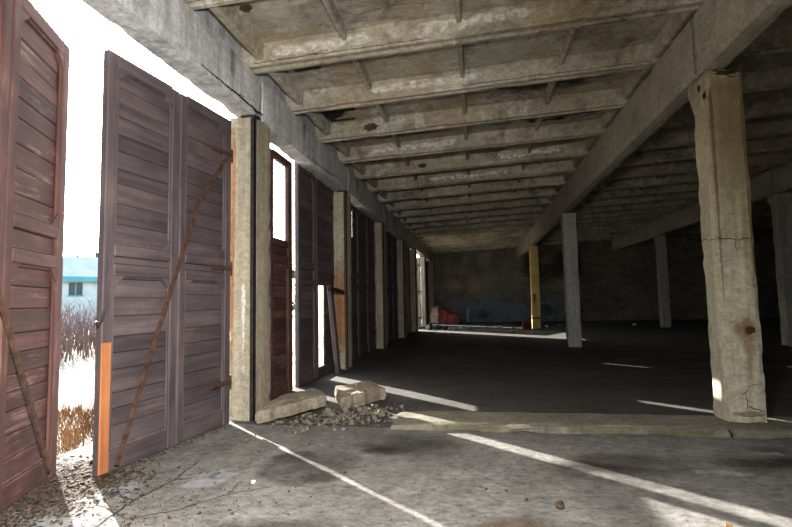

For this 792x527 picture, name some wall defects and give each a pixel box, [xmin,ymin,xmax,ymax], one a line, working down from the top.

corrosion [738,319,756,336]